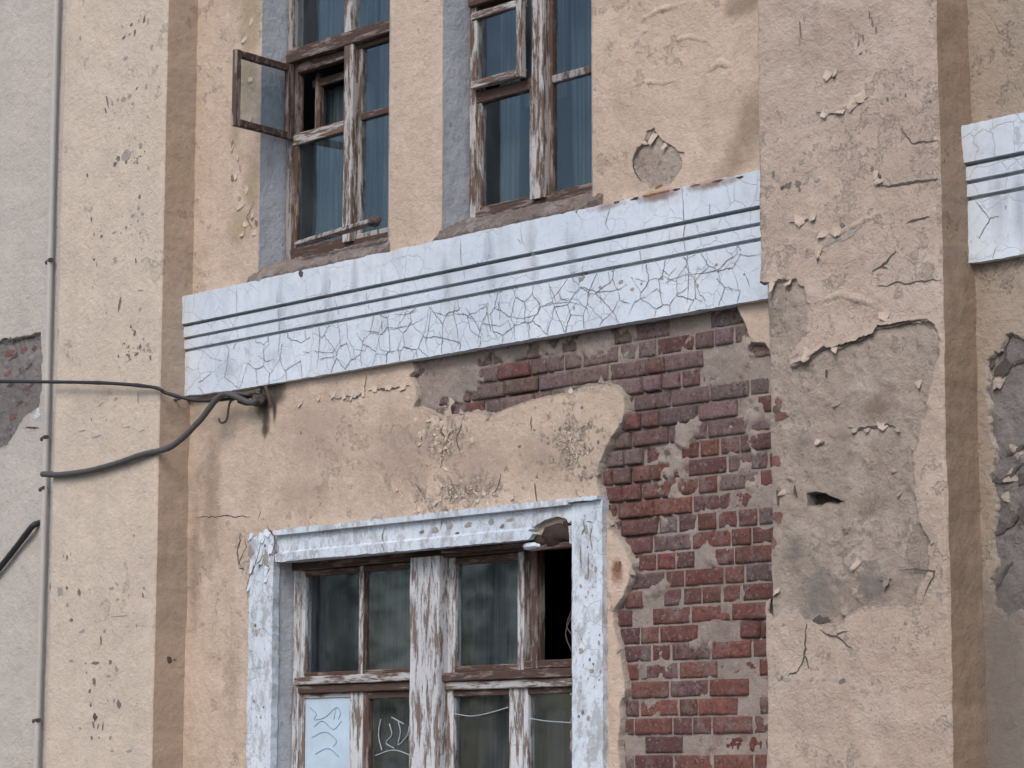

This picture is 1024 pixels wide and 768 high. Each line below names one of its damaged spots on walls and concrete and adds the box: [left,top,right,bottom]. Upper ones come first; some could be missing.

flaking render [632,127,685,189]
peeling [816,90,932,118]
crack [900,127,938,144]
crack [198,186,761,391]
crack [872,251,942,287]
flaking render [0,332,43,449]
flaking render [984,331,1024,622]
crack [196,511,276,589]
flaking render [296,278,940,768]
crack [788,624,851,676]